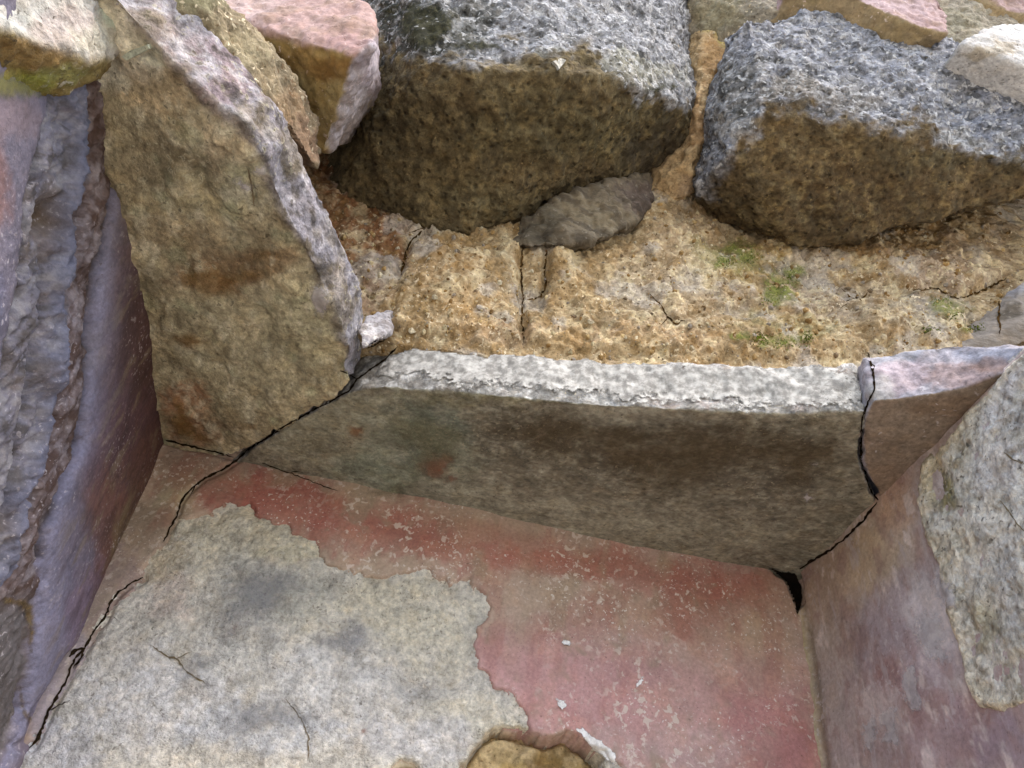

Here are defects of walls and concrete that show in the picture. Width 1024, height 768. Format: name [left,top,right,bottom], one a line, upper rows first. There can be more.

crack [520,246,548,338]
crack [163,347,397,541]
crack [800,353,878,569]
crack [29,577,143,748]
flaking render [21,502,622,768]